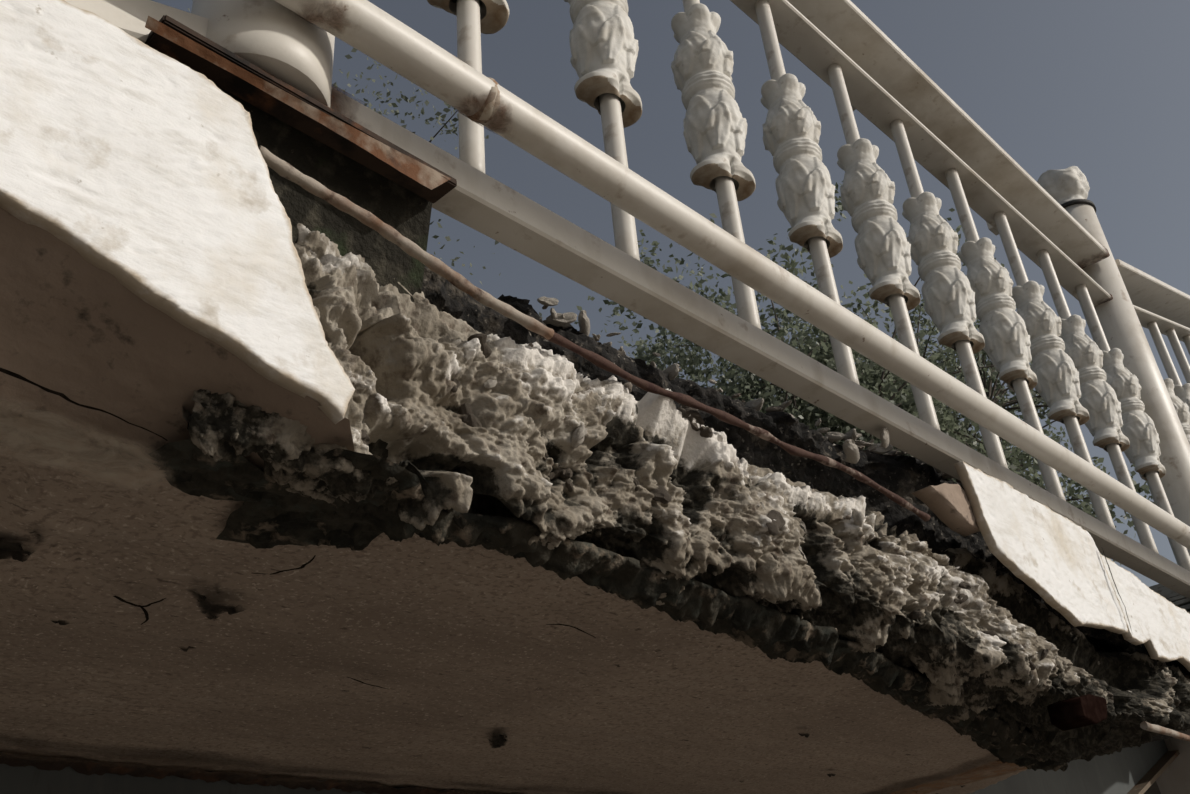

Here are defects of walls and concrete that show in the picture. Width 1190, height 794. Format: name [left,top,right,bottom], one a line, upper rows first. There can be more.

corrosion [330,87,352,119]
crack [0,368,168,441]
spalling [148,145,1190,763]